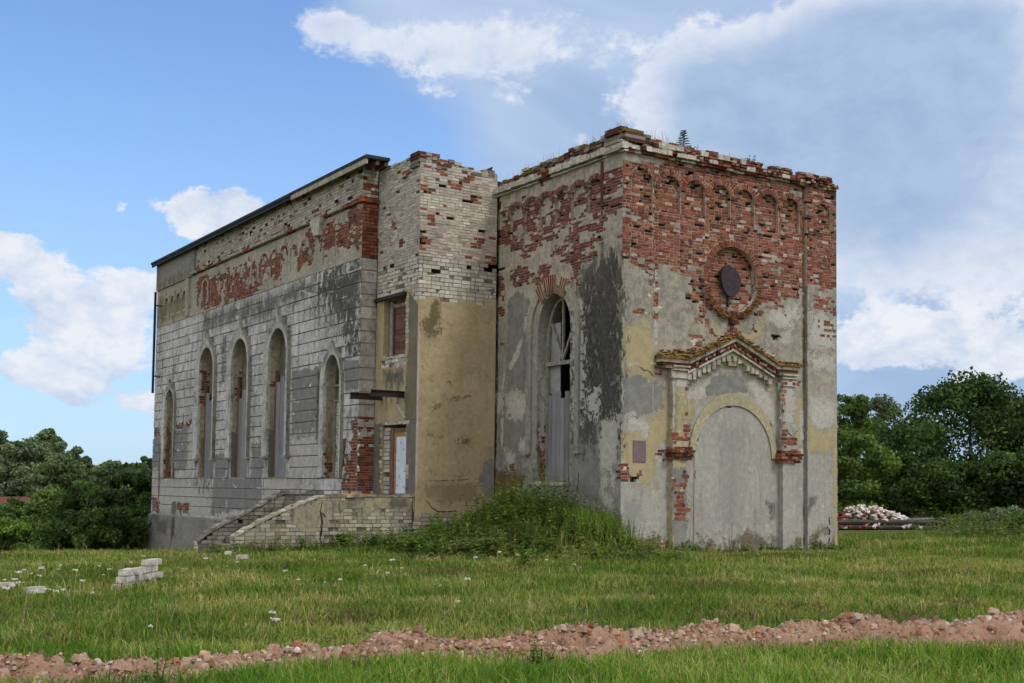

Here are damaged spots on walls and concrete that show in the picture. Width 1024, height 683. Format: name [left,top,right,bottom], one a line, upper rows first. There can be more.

spalling [196,203,363,314]
peeling [151,415,213,516]
spalling [199,370,209,406]
leakage [203,258,362,384]
peeling [251,294,464,543]
leakage [422,301,442,337]
leakage [569,238,630,461]
spalling [470,152,838,551]
crack [320,503,341,544]